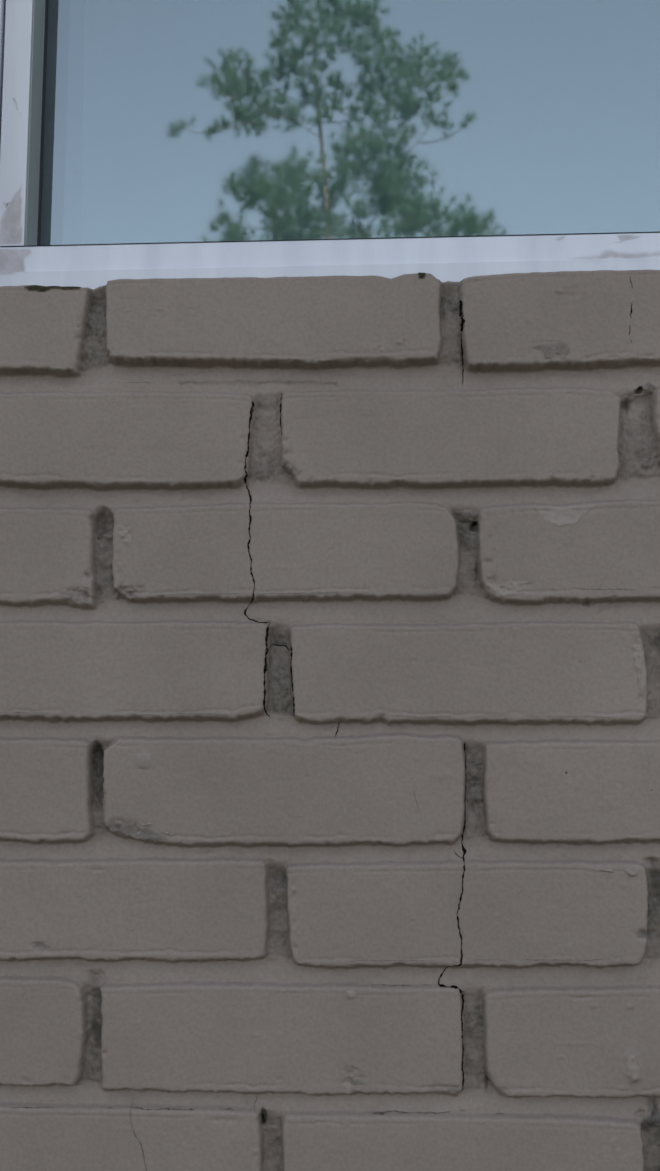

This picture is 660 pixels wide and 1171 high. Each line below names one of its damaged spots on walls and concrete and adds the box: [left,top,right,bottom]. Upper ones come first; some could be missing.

crack [234,380,295,717]
crack [371,743,505,1115]